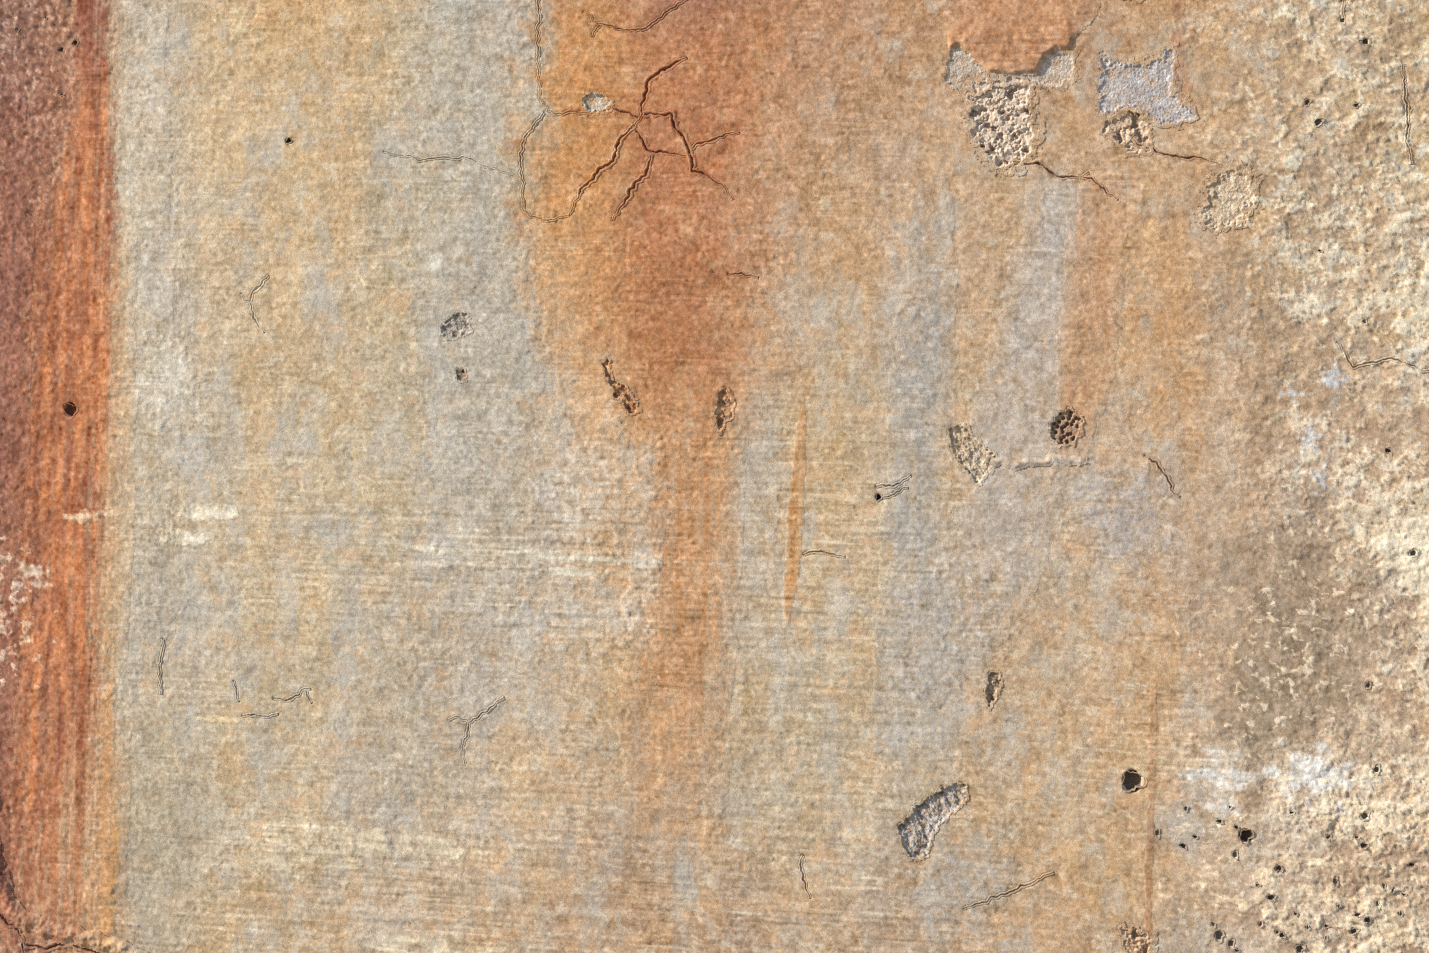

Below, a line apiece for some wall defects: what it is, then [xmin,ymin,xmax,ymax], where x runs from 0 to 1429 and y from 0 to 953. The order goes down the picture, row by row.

crack [384,0,739,223]
peeling [936,0,1204,178]
corrosion [0,0,146,953]
corrosion [491,0,902,875]
crack [0,909,100,953]
spalling [895,780,970,862]